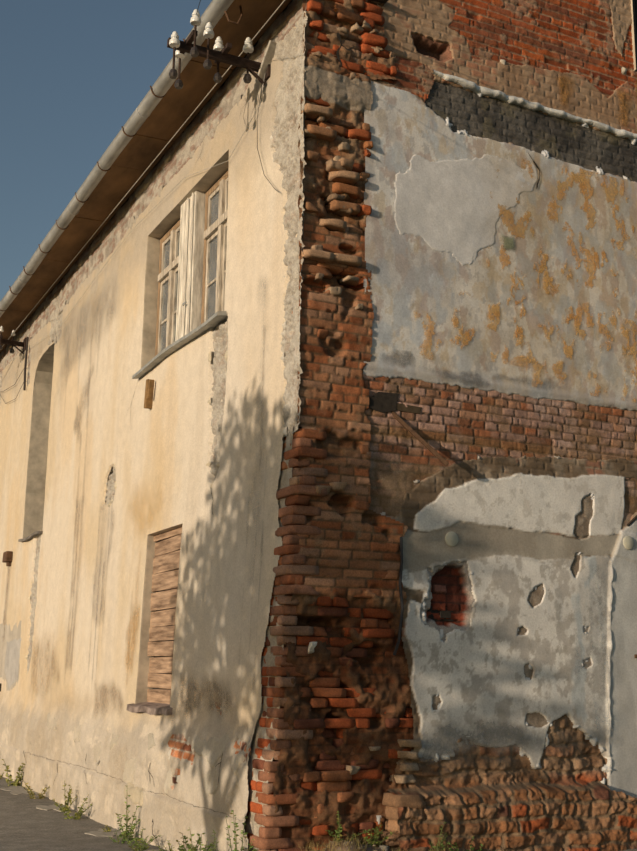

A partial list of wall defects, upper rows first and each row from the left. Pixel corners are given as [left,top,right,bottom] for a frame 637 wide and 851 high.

flaking render [389,33,452,102]
flaking render [439,0,637,98]
flaking render [0,0,308,437]
flaking render [206,316,228,489]
flaking render [363,304,637,518]
flaking render [104,463,117,507]
flaking render [574,494,594,539]
flaking render [623,478,637,527]
spalling [421,561,475,642]
flaking render [571,552,581,578]
peeling [148,733,251,794]
flaking render [388,712,637,851]